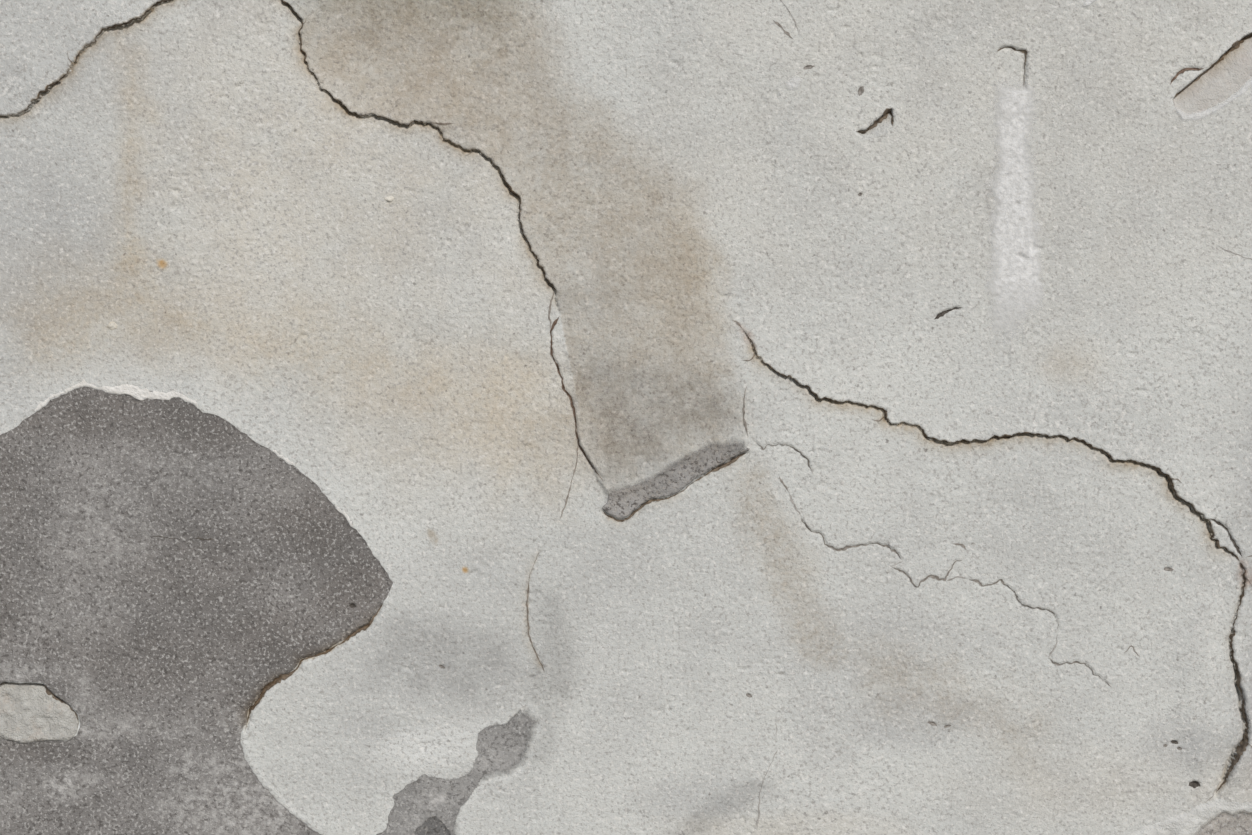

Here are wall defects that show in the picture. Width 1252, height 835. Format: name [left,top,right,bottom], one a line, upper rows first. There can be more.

crack [0,0,172,117]
crack [772,0,798,39]
crack [998,47,1027,90]
spalling [1170,33,1252,115]
crack [281,0,603,518]
crack [935,307,962,319]
peeling [601,443,749,522]
peeling [0,379,393,835]
crack [526,553,544,671]
crack [732,320,1252,802]
peeling [377,710,534,835]
peeling [1131,798,1252,835]